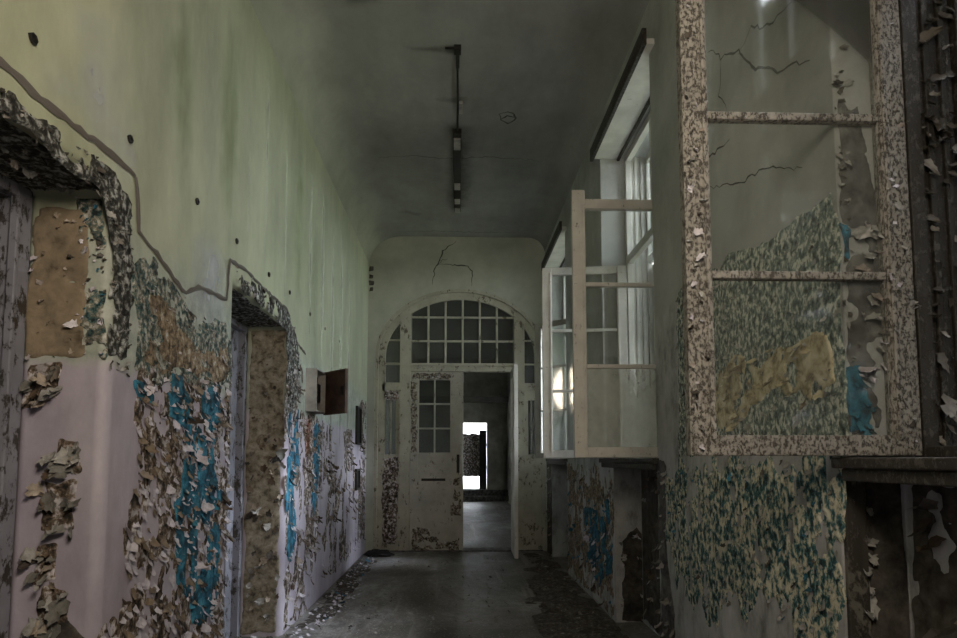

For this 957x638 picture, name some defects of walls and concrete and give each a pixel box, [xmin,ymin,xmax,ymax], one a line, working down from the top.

peeling [918,0,956,44]
peeling [832,70,859,114]
peeling [919,43,957,185]
crack [432,244,473,286]
spalling [0,87,368,638]
peeling [384,372,454,453]
peeling [545,126,957,638]
peeling [381,457,399,545]